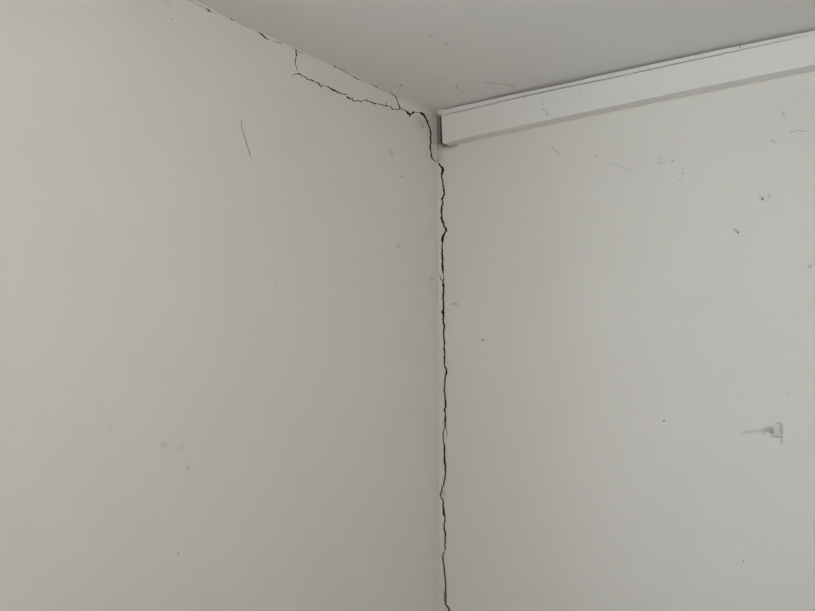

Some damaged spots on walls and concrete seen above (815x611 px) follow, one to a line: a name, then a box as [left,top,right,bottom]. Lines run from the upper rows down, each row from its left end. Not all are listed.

crack [190,0,450,611]